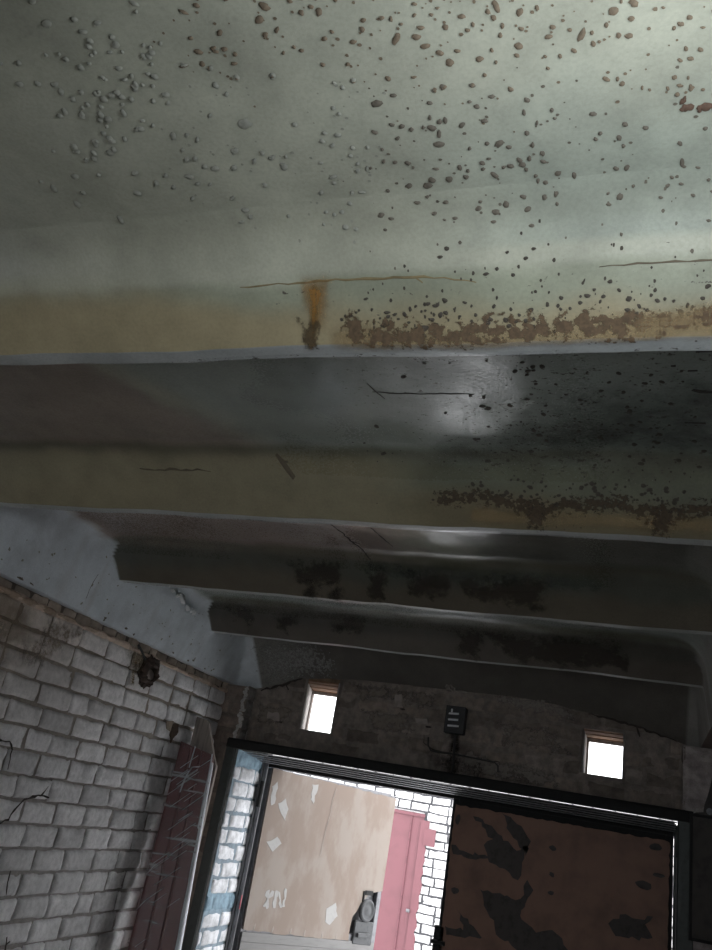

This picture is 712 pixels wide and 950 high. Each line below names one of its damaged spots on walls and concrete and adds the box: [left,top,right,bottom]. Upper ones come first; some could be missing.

peeling [253,0,304,55]
peeling [287,0,337,17]
peeling [541,0,639,70]
peeling [179,22,256,108]
peeling [307,0,576,244]
peeling [160,127,296,204]
crack [599,259,712,267]
corrosion [298,286,324,358]
corrosion [340,303,712,350]
crack [368,384,474,399]
corrosion [433,486,712,538]
crack [0,787,49,824]